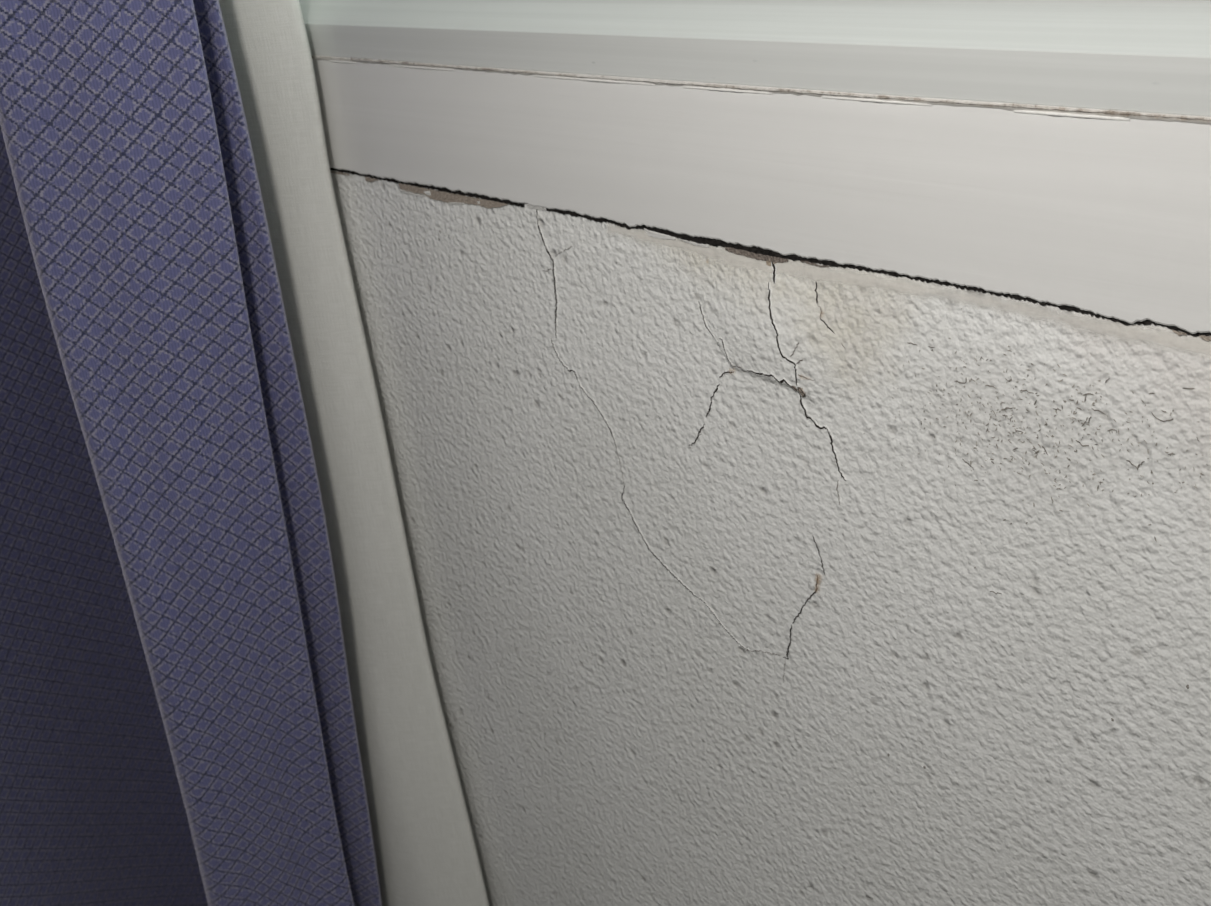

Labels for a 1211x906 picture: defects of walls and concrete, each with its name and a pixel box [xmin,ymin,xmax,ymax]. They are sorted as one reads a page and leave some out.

crack [330,168,1211,682]